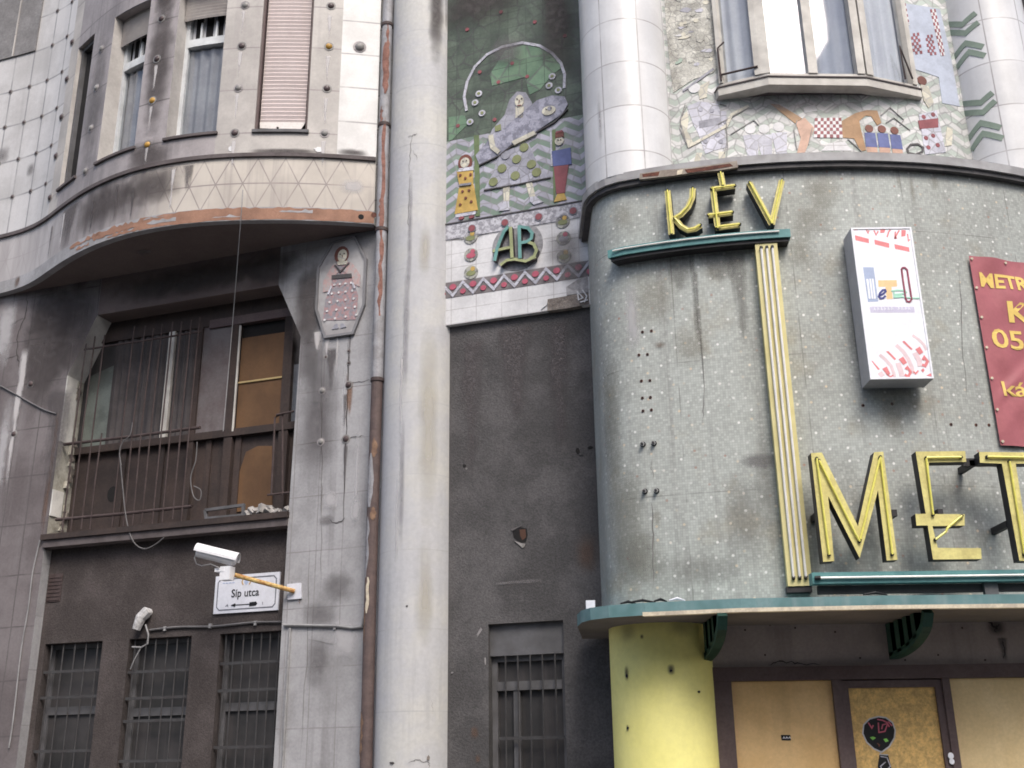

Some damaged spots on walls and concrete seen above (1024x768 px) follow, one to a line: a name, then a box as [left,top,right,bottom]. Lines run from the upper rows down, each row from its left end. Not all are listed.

corrosion [382,24,390,93]
water stain [170,165,193,205]
peeling [70,207,376,250]
corrosion [377,106,386,316]
crack [407,134,417,232]
water stain [0,309,12,350]
water stain [0,354,27,473]
hole [511,526,528,548]
crack [648,504,656,582]